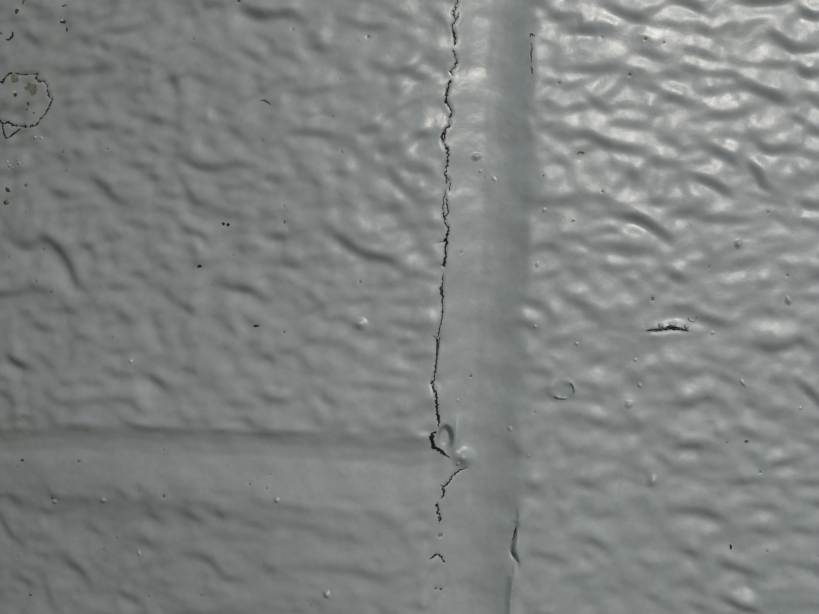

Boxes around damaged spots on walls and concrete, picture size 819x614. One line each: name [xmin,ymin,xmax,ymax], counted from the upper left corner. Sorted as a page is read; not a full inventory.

crack [0,72,53,139]
crack [430,0,459,426]
crack [435,467,467,521]